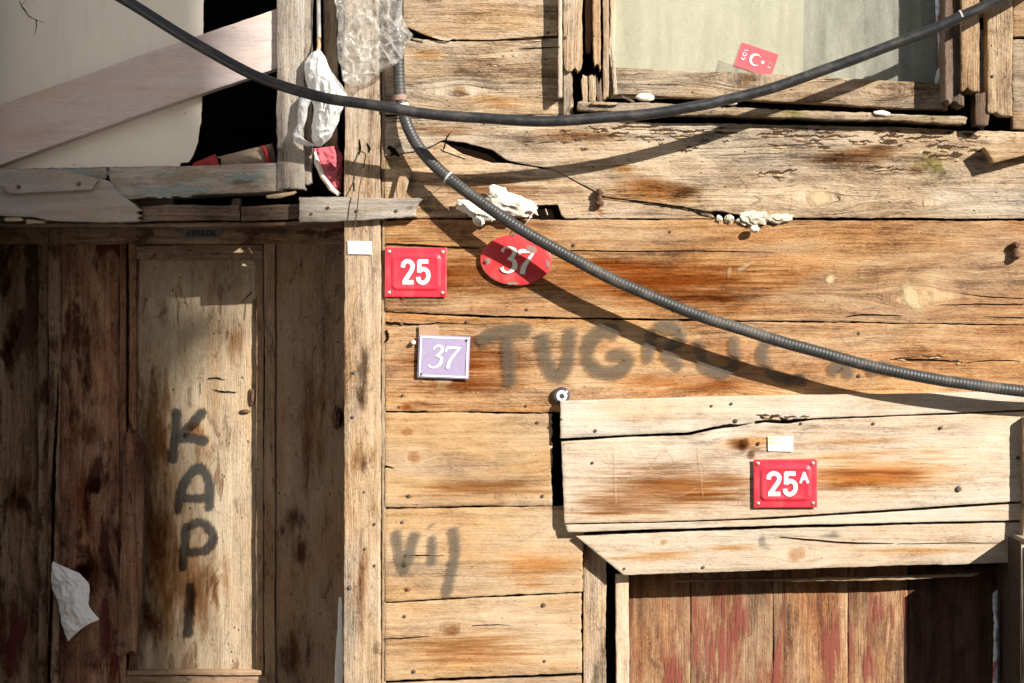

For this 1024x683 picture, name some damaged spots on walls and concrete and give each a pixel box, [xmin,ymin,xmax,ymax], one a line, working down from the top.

crack [358,139,400,157]
crack [438,132,529,166]
crack [603,197,716,218]
crack [716,416,801,428]